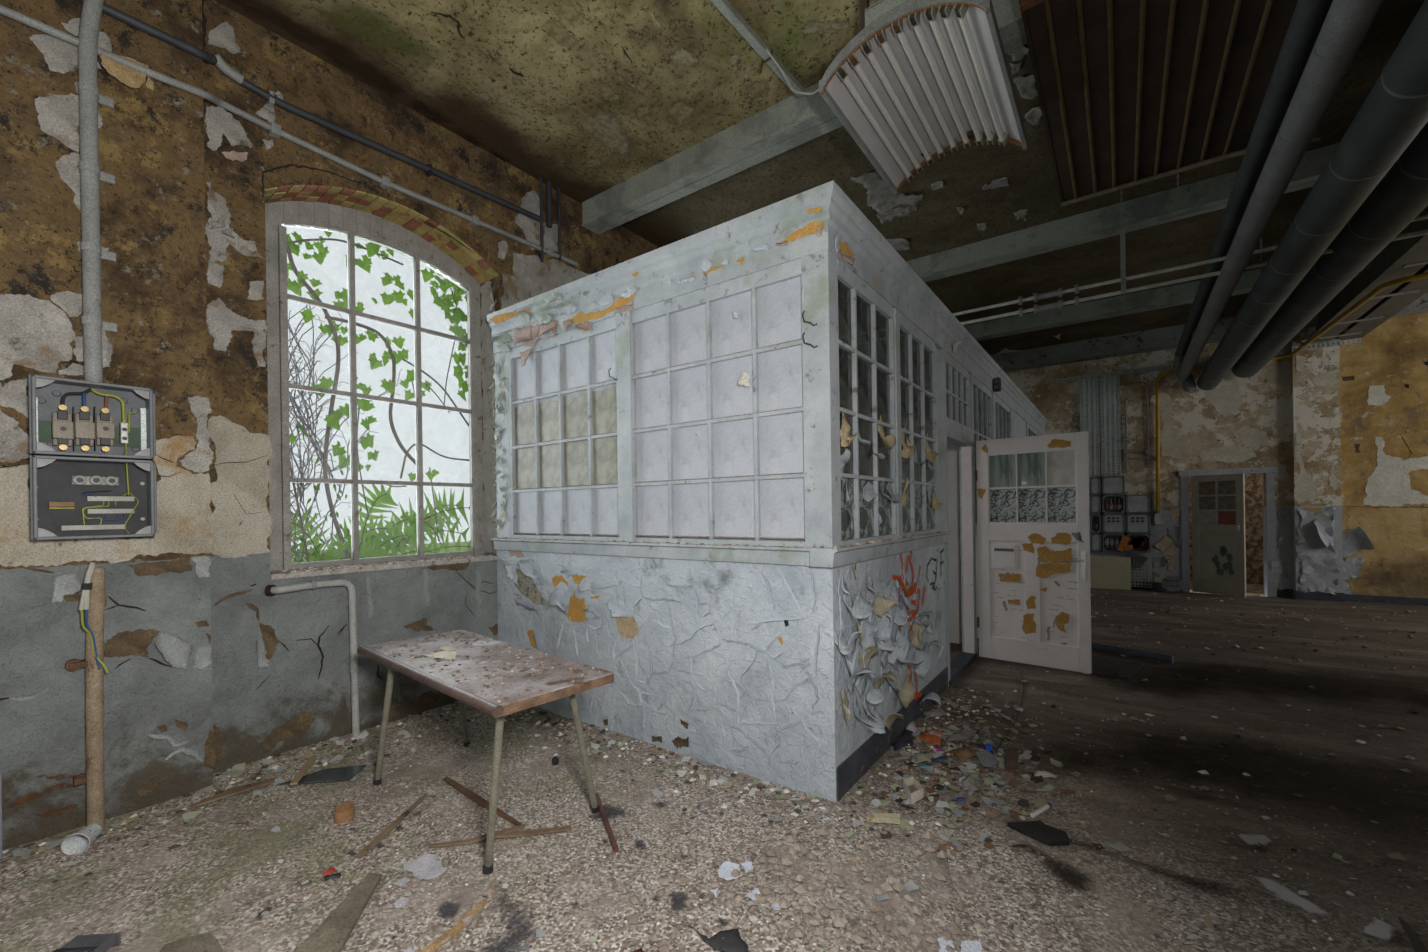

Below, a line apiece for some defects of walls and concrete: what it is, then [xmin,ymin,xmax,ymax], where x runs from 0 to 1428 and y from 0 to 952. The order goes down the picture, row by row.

peeling [29,18,81,213]
peeling [205,106,274,162]
peeling [205,181,267,367]
peeling [0,291,273,603]
peeling [480,191,639,639]
peeling [1355,436,1428,507]
crack [21,565,54,573]
crack [105,596,146,612]
crack [214,584,256,606]
crack [0,687,48,701]
crack [296,624,347,679]
crack [557,558,946,776]